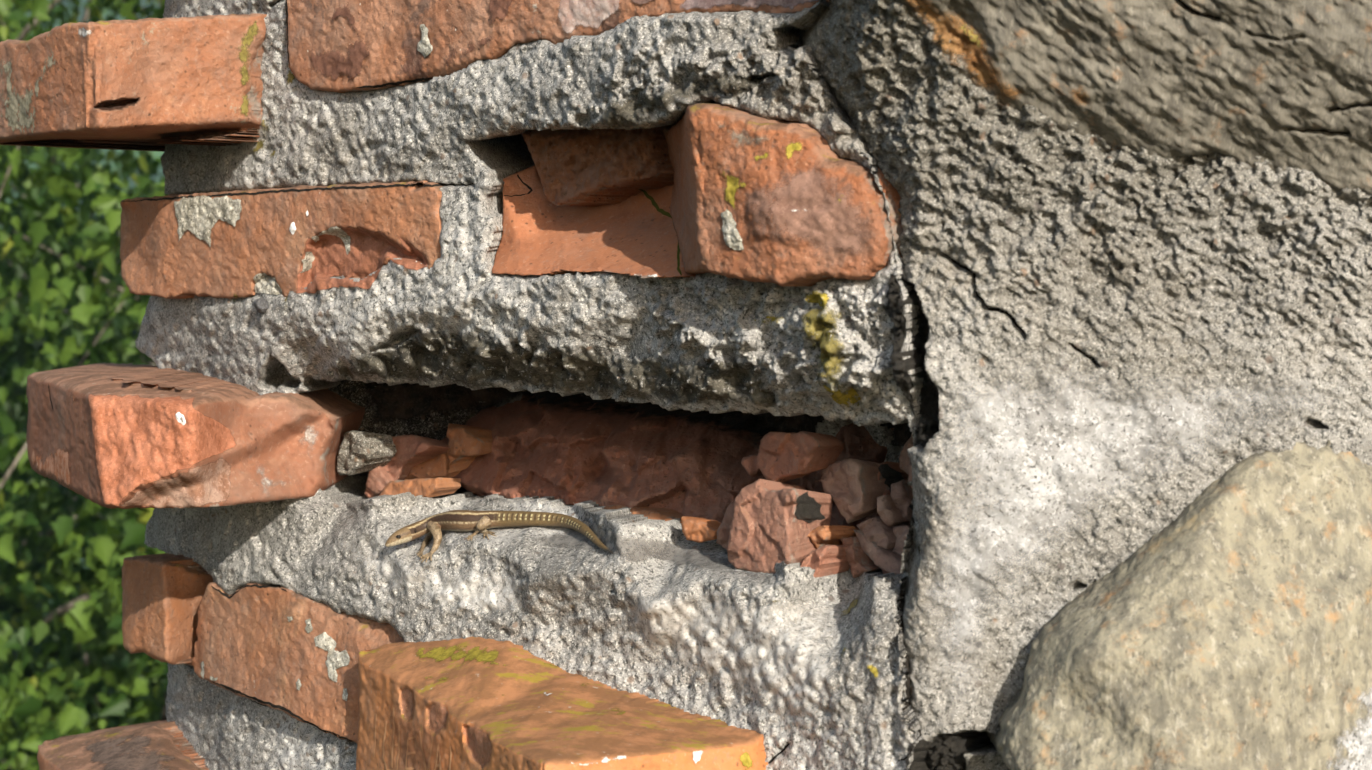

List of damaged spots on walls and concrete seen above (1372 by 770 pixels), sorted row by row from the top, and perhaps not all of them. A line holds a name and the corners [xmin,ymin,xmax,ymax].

crack [1179,0,1221,19]
crack [1288,104,1372,134]
spalling [491,73,768,278]
crack [945,254,1026,335]
crack [1071,345,1099,366]
crack [889,590,921,761]